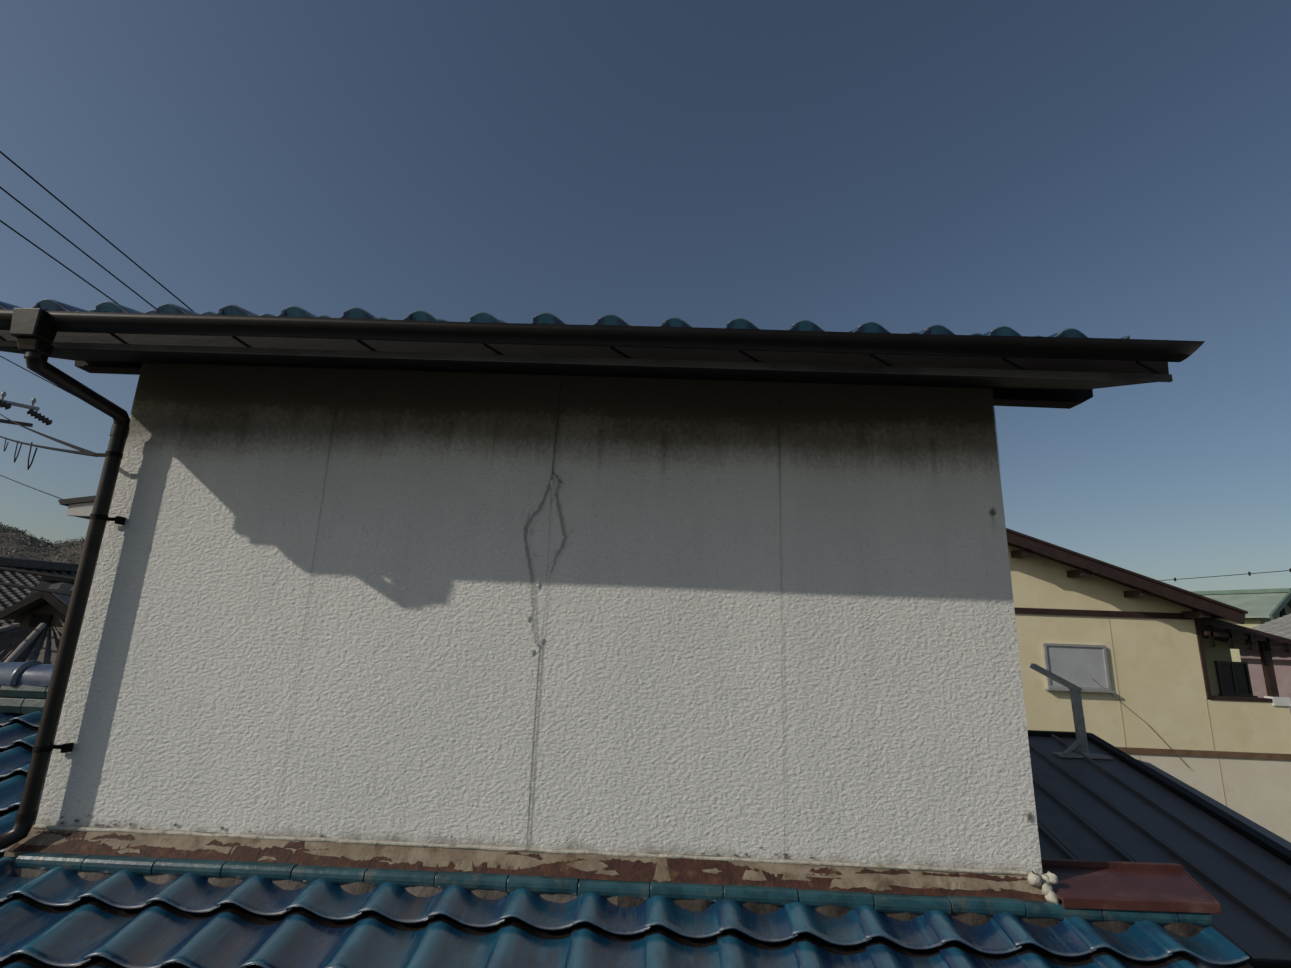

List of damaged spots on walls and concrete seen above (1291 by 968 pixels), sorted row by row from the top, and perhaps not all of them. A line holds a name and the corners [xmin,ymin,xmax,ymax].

damp [130,363,997,455]
crack [524,382,572,847]
peeling [454,857,473,872]
peeling [653,857,671,882]
peeling [700,847,811,881]
peeling [830,879,892,891]
peeling [921,881,1001,891]